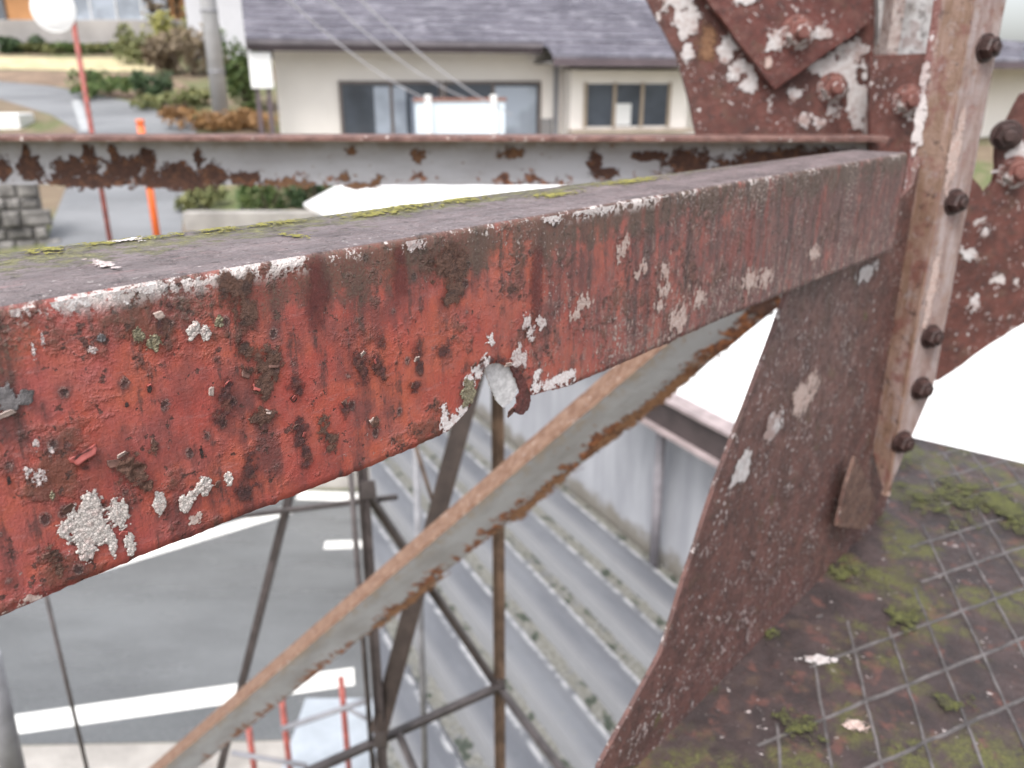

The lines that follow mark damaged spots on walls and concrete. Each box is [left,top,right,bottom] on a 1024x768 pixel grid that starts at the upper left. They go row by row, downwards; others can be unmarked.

peeling [656,0,706,65]
peeling [716,28,784,94]
peeling [807,25,870,130]
rust [0,143,384,192]
rust [585,149,620,181]
rust [630,144,855,173]
rust [743,296,779,316]
peeling [504,312,576,394]
rust [293,399,350,469]
rust [476,344,731,548]
peeling [23,467,137,565]
peeling [152,471,234,526]